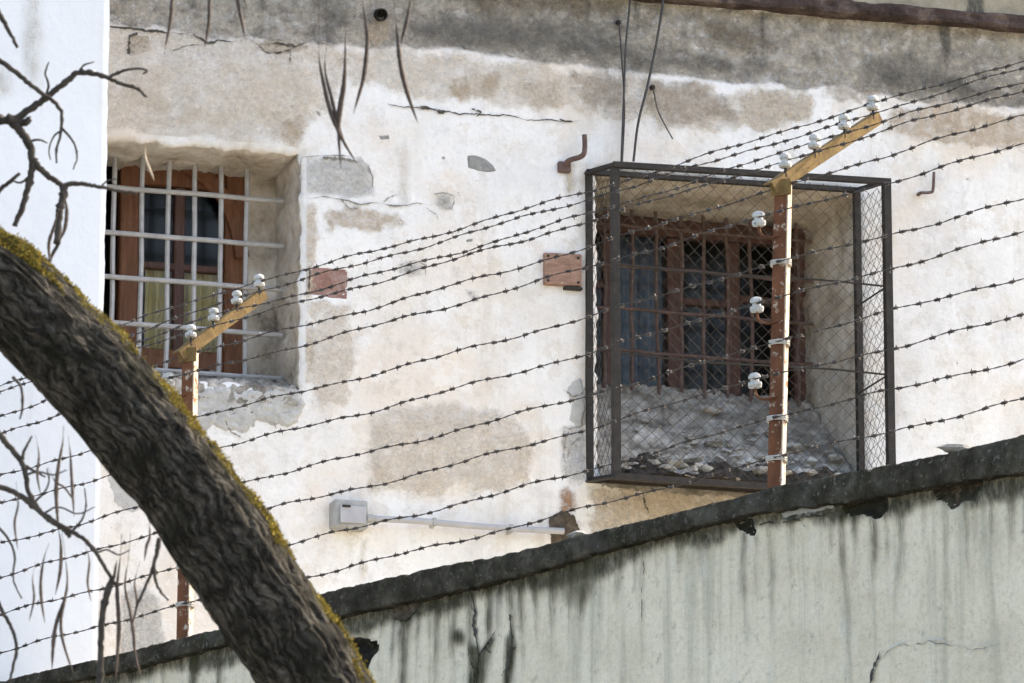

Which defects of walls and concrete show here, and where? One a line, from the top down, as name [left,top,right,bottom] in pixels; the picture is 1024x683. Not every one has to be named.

crack [110,26,330,63]
crack [387,103,581,122]
crack [299,155,454,221]
spalling [197,386,306,433]
water stain [340,475,1024,683]
water stain [71,646,239,683]
crack [468,596,516,683]
crack [870,633,1018,683]